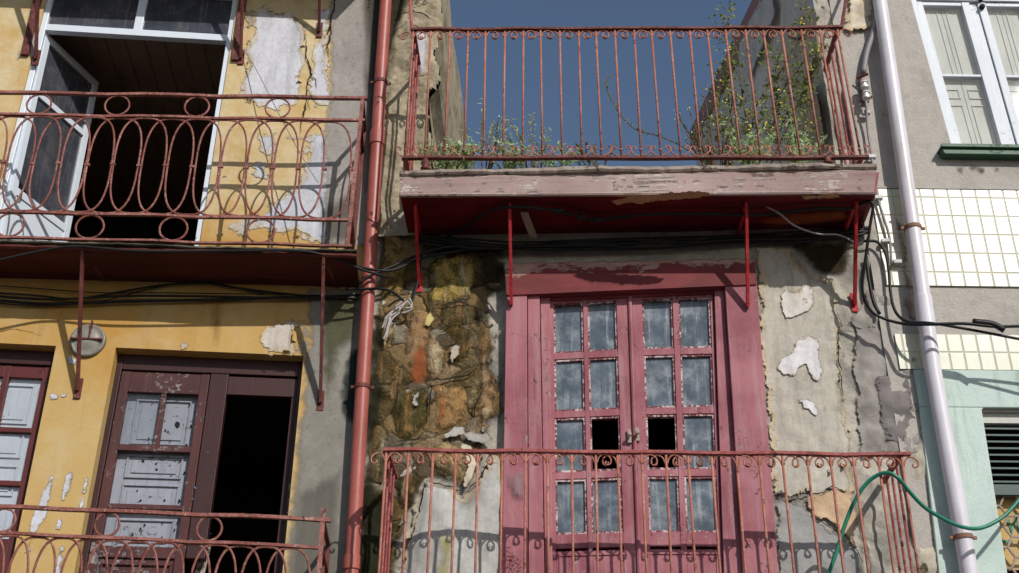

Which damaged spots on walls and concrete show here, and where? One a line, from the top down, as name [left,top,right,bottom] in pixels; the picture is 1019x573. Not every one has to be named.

peeling [239,4,331,111]
peeling [228,132,331,243]
peeling [260,316,309,356]
damp [324,299,355,380]
damp [343,350,358,421]
damp [366,319,385,448]
flaking render [367,235,506,573]
damp [475,250,504,319]
flaking render [827,290,921,473]
damp [295,481,335,573]
damp [360,465,394,573]
flaking render [758,489,862,573]